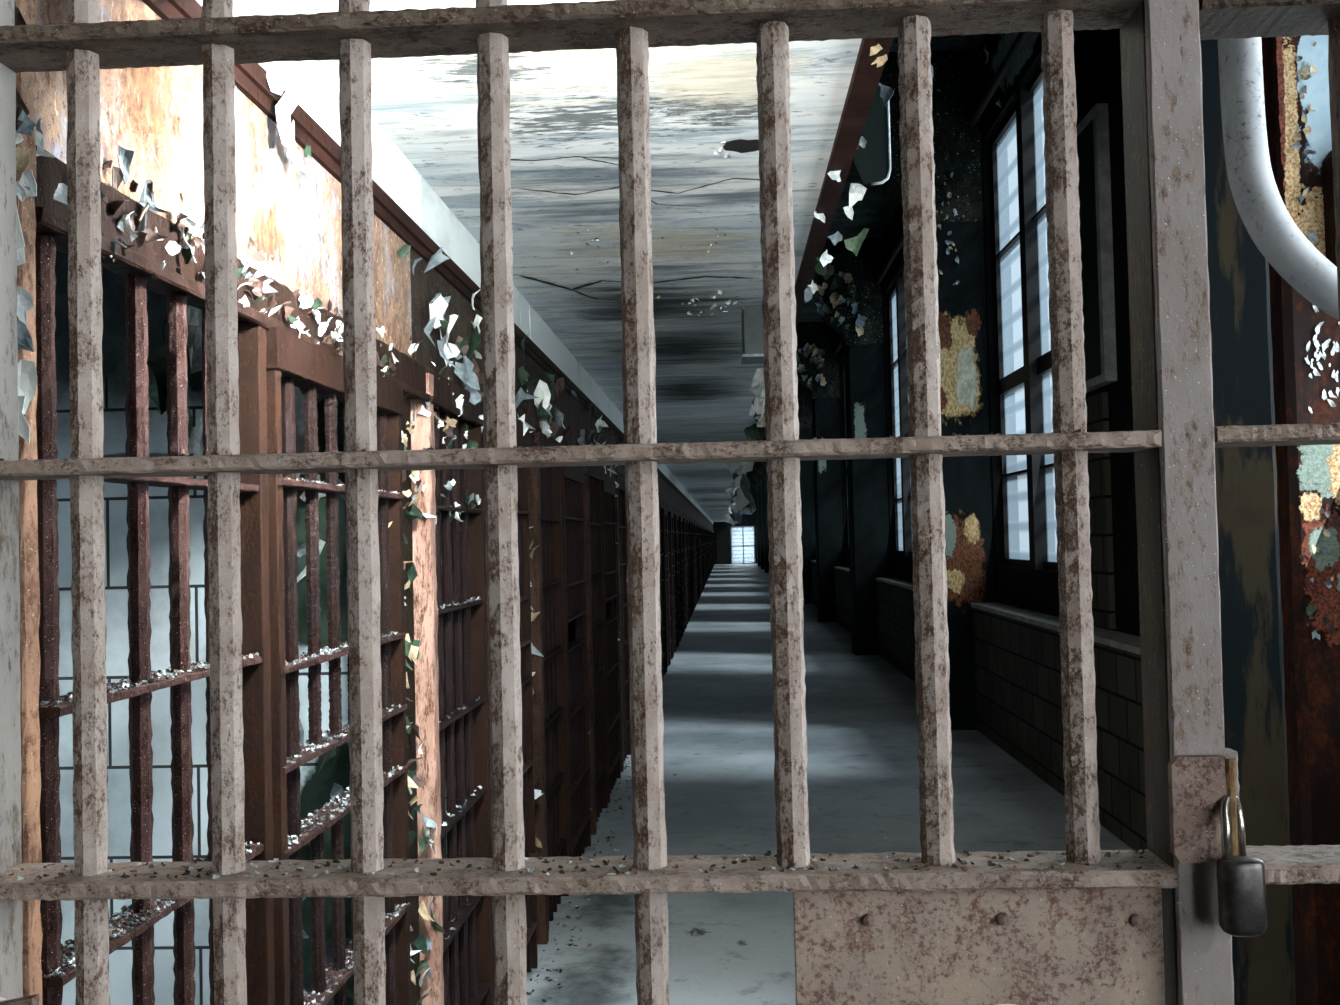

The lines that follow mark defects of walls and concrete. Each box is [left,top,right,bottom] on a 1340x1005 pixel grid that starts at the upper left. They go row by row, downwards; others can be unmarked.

corrosion [108,66,180,164]
corrosion [255,204,286,264]
damp [651,168,706,182]
damp [692,192,760,204]
peeling [804,170,869,337]
peeling [1276,35,1332,257]
damp [653,287,729,319]
peeling [376,289,484,450]
damp [655,334,742,400]
peeling [1305,305,1340,413]
peeling [1297,444,1340,522]
corrosion [1300,504,1340,649]